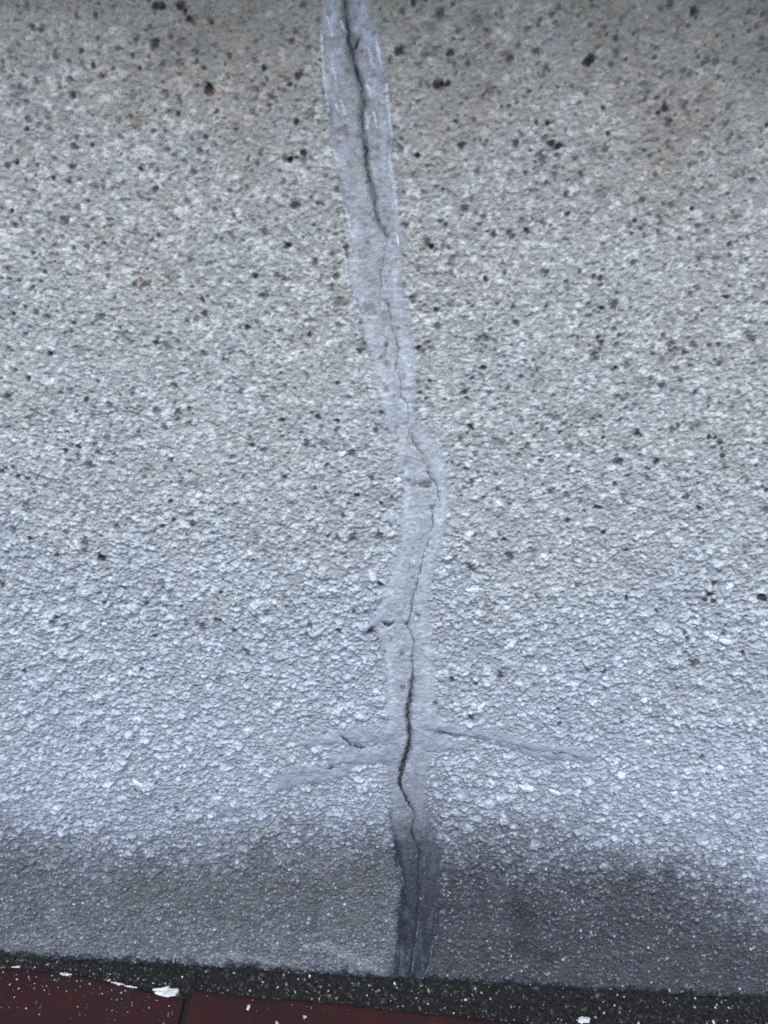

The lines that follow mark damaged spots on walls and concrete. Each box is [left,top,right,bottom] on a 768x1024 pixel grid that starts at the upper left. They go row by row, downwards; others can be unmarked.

crack [344,0,441,972]
crack [318,736,366,769]
crack [437,731,577,758]